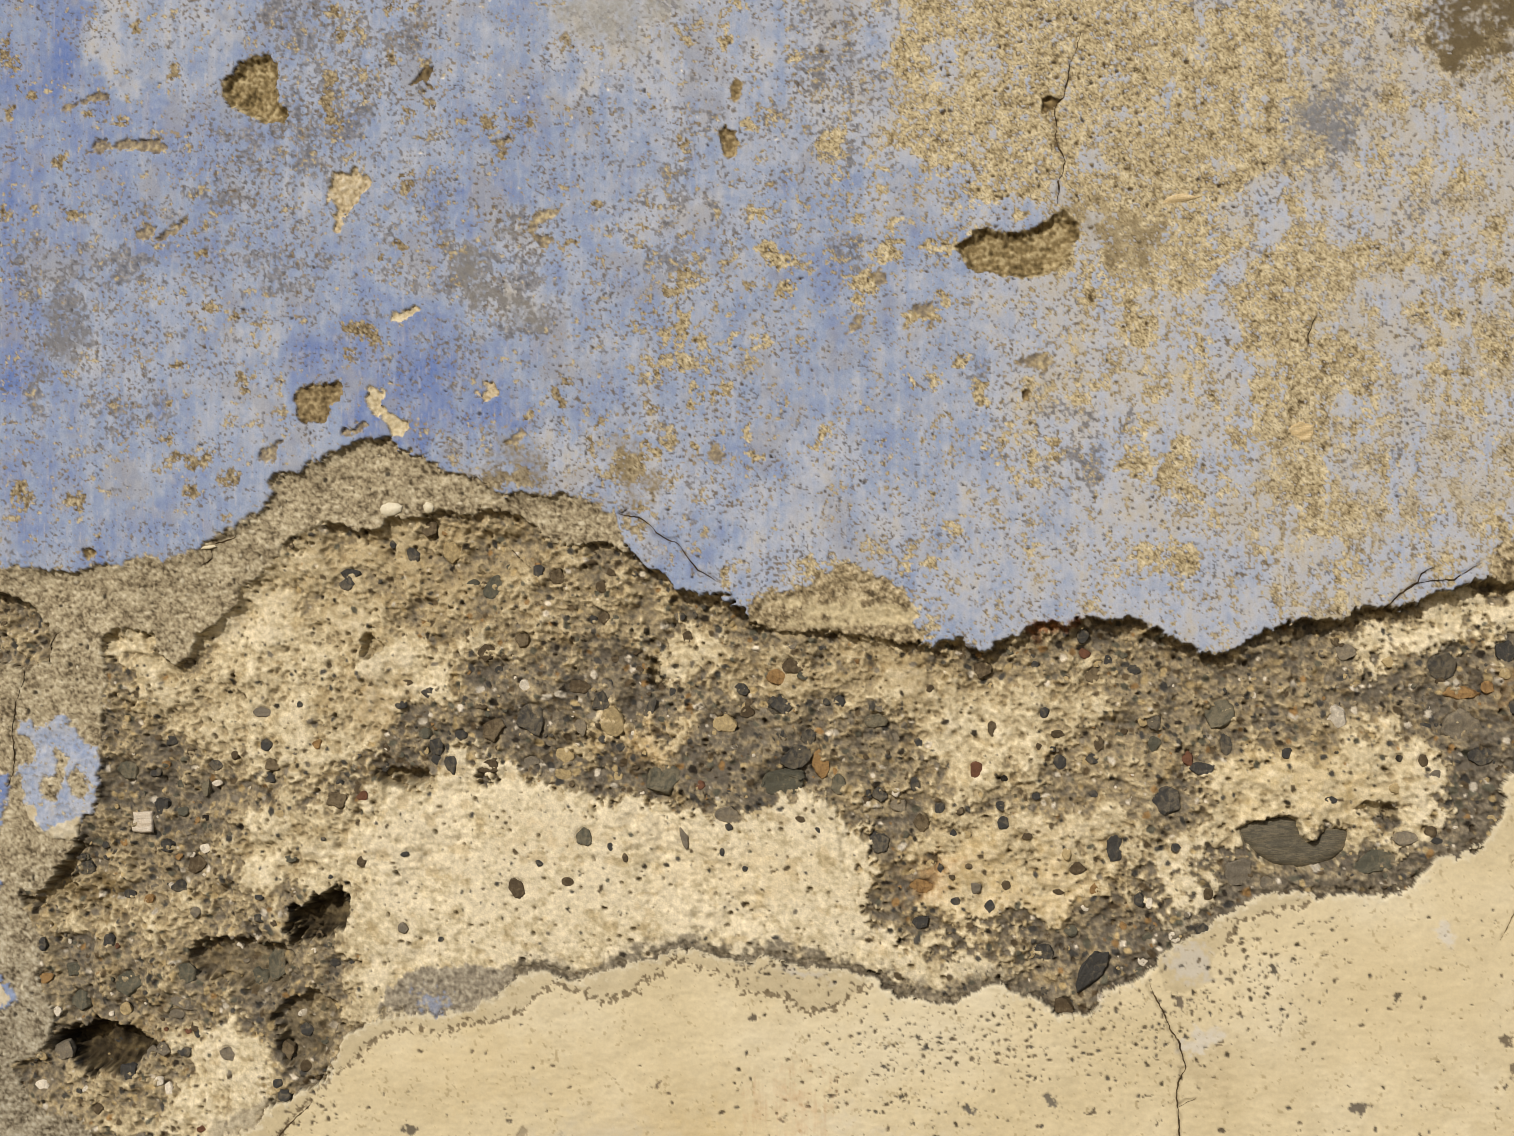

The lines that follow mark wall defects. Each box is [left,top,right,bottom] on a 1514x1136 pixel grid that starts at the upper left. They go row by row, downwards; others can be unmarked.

spalling [221,54,290,125]
crack [1054,34,1081,203]
peeling [901,0,1325,292]
spalling [327,165,373,234]
spalling [259,438,287,466]
spalling [294,379,410,438]
spalling [503,427,526,452]
spalling [708,443,728,465]
crack [621,509,714,580]
spalling [0,509,1514,1136]
crack [1150,985,1194,1136]